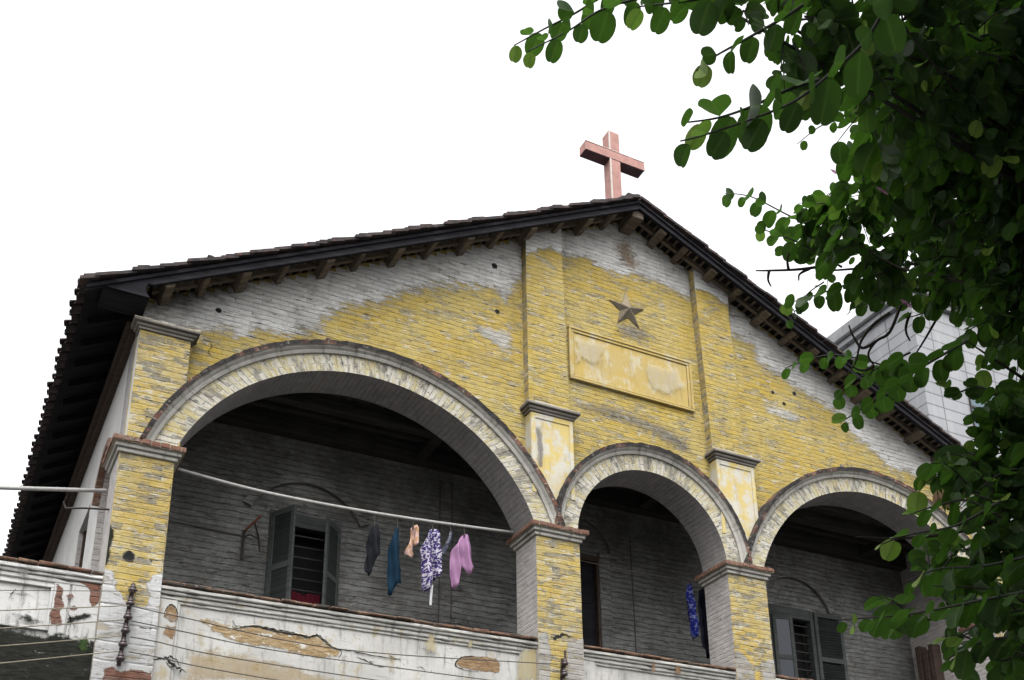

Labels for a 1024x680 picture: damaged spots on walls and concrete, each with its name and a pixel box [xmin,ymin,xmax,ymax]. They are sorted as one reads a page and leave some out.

peeling [143,223,937,477]
spalling [49,584,77,626]
peeling [74,568,178,680]
crack [154,655,186,673]
spalling [201,618,342,658]
crack [232,620,424,669]
spalling [455,656,500,673]